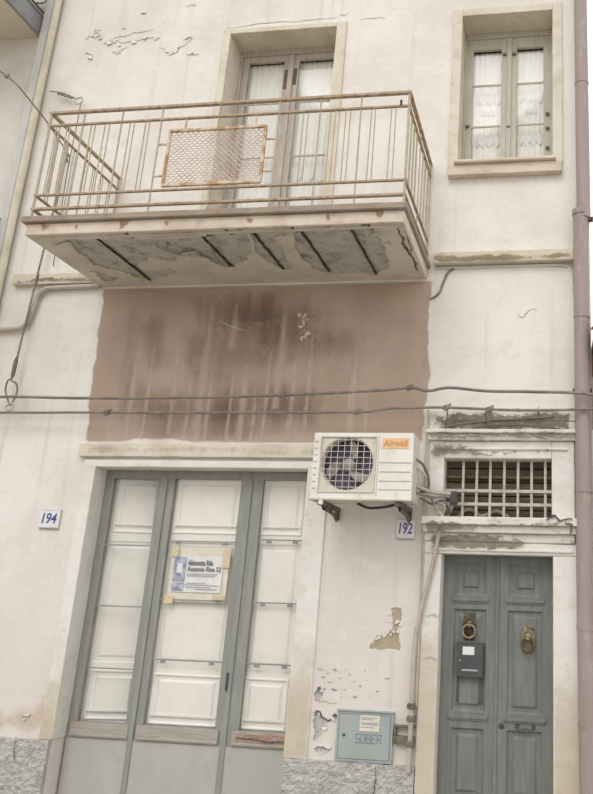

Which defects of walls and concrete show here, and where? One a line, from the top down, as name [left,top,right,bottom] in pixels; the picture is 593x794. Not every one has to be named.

peeling [86,27,198,55]
spalling [67,224,389,282]
damp [87,282,573,456]
peeling [369,607,402,650]
spalling [314,668,361,700]
spalling [312,712,338,754]